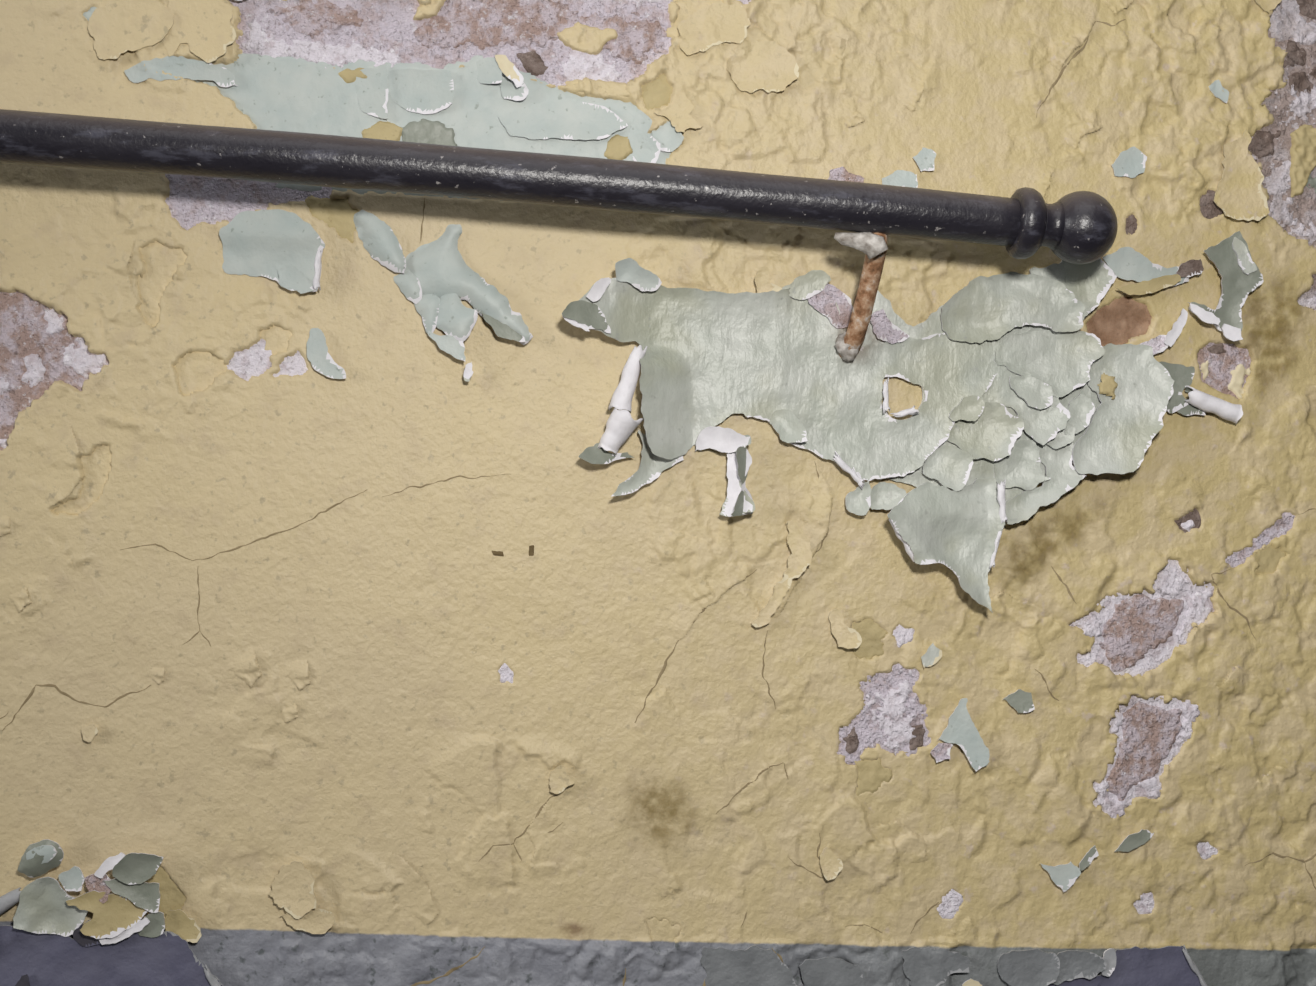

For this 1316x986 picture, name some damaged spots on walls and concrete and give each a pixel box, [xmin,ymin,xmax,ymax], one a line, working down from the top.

peeling [83,0,799,164]
flaking render [0,291,109,450]
peeling [165,174,533,382]
peeling [562,0,1316,627]
flaking render [1069,559,1215,677]
flaking render [828,608,990,796]
flaking render [1093,695,1200,818]
peeling [0,839,224,986]
peeling [269,861,335,934]
spalling [937,889,963,919]
peeling [1040,829,1154,892]
peeling [997,945,1207,986]